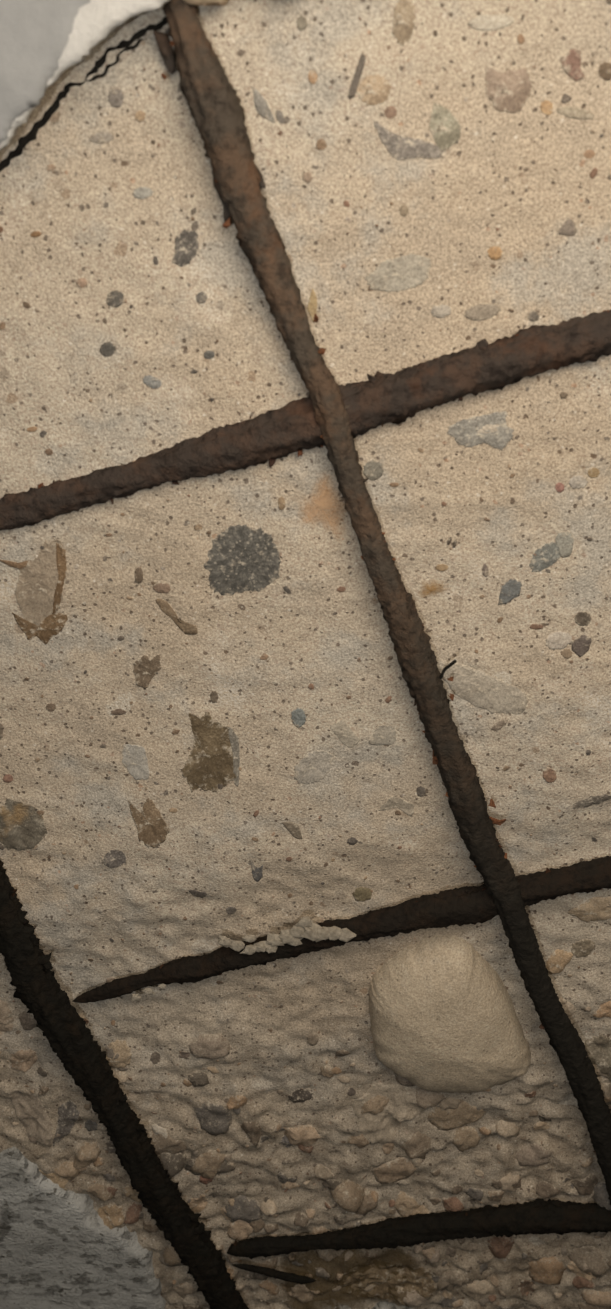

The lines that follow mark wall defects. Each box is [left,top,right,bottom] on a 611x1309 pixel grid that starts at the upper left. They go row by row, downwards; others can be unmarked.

spalling [0,0,326,531]
spalling [0,446,611,1309]
corrosion [282,1249,416,1309]
spalling [153,0,611,1205]